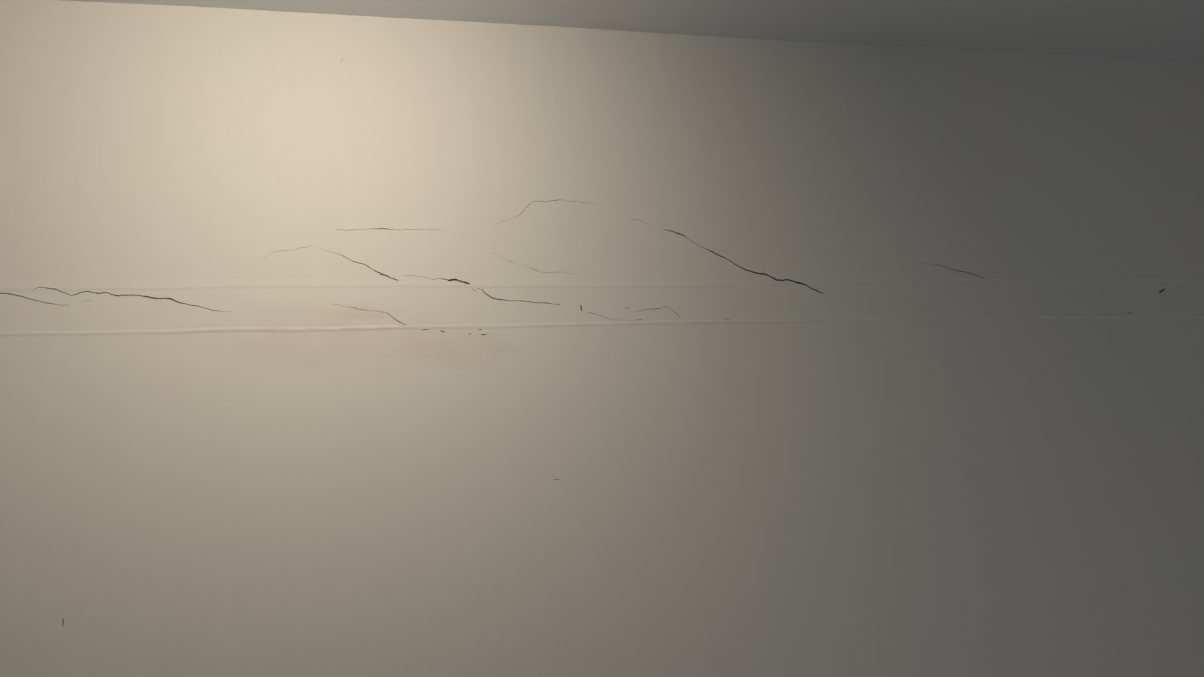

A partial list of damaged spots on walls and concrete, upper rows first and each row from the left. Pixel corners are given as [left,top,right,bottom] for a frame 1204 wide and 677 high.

crack [0,287,230,312]
crack [263,228,561,305]
crack [634,219,824,294]